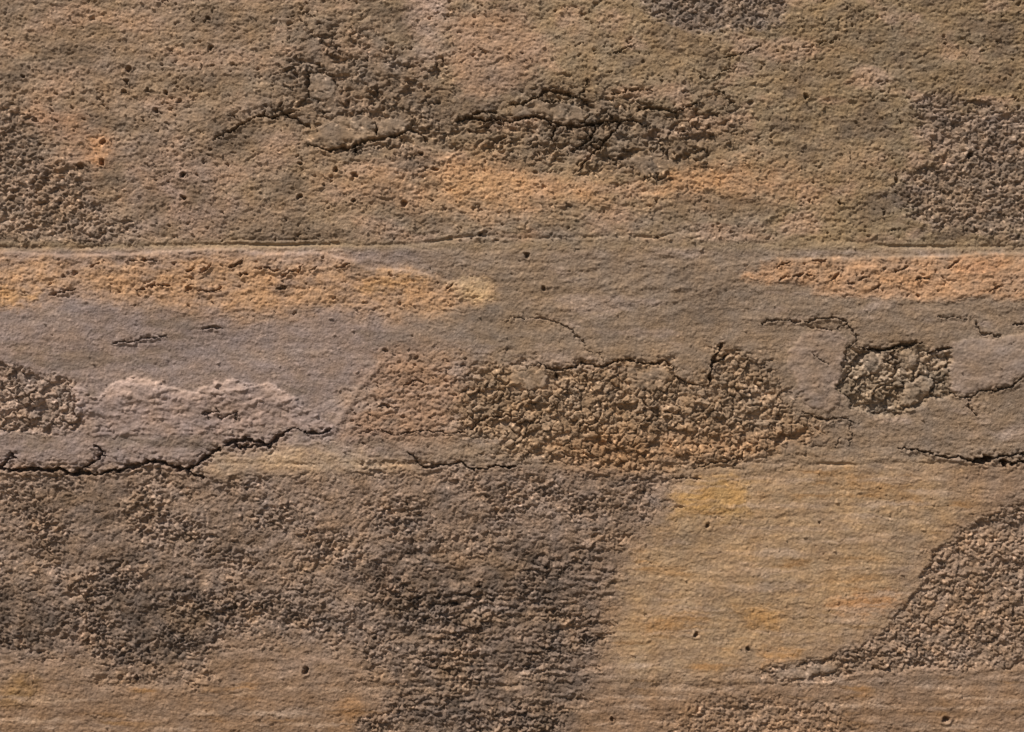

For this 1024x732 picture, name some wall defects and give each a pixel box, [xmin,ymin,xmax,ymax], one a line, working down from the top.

crack [212,100,429,153]
crack [453,44,763,173]
crack [758,316,952,357]
crack [936,314,1024,338]
crack [0,379,527,477]
spalling [836,343,953,419]
crack [897,447,1024,469]
crack [949,376,1024,418]
spalling [0,343,835,732]
spalling [660,503,1024,732]